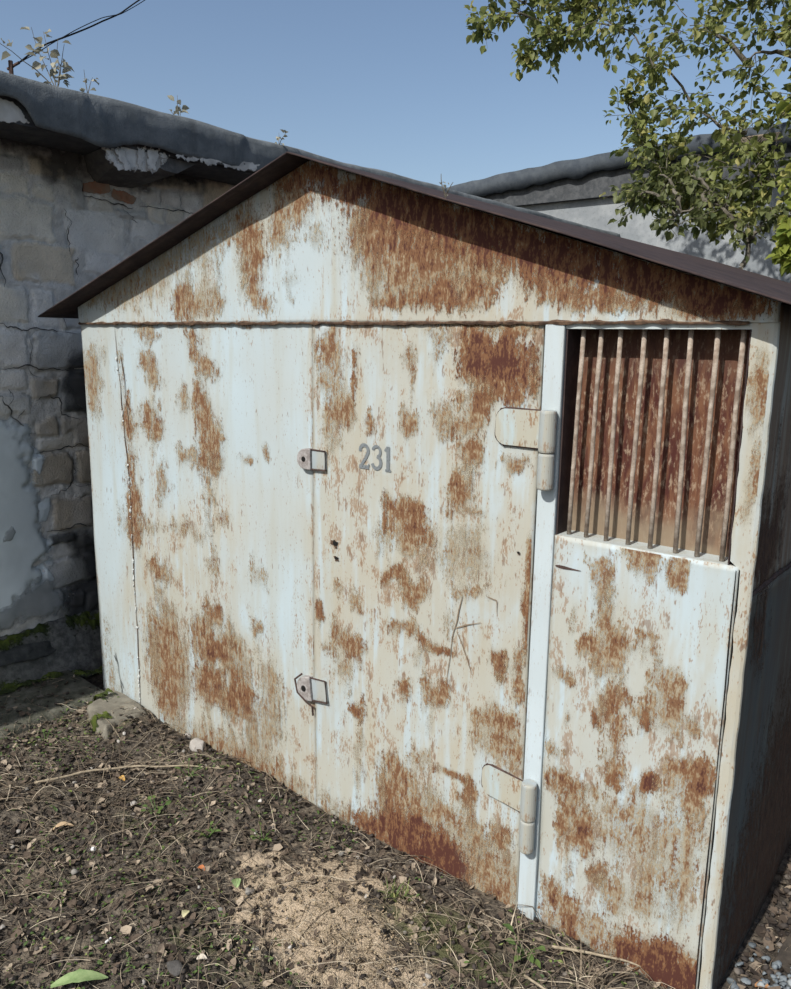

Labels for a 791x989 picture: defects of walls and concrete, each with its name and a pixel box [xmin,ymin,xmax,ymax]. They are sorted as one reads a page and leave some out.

spalling [0,98,30,124]
spalling [102,146,260,174]
peeling [0,417,54,612]
rust [79,161,778,908]
rust [739,348,791,681]
rust [537,548,717,989]